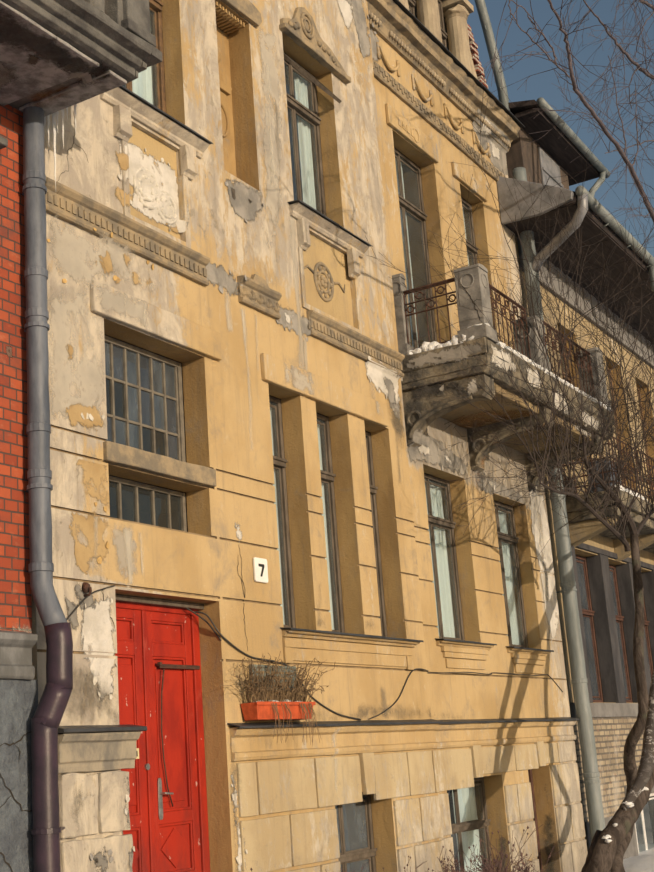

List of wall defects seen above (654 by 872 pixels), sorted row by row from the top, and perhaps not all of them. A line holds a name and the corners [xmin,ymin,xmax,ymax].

leakage [0,8,110,80]
spalling [338,0,379,62]
peeling [115,133,189,233]
spalling [225,179,264,223]
peeling [47,222,154,288]
peeling [49,294,105,431]
peeling [365,342,599,437]
peeling [69,457,110,575]
peeling [408,429,559,639]
peeling [64,582,118,702]
crack [0,732,31,760]
crack [0,773,32,812]